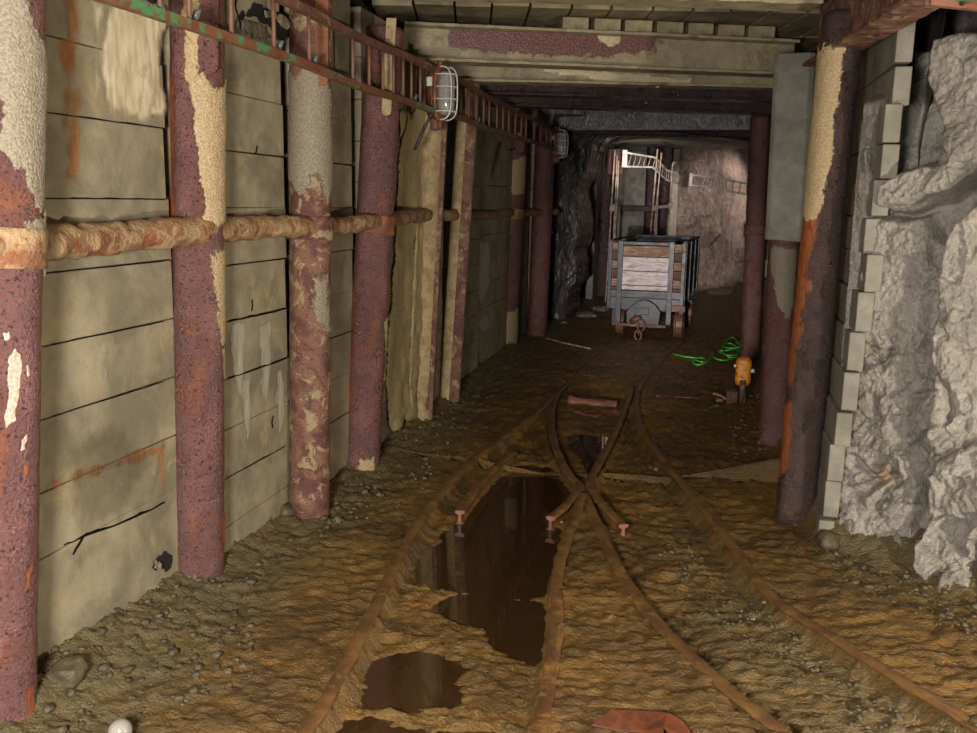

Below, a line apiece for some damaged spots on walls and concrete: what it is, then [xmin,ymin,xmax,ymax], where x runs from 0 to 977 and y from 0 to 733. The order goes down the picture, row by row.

corrosion [60,0,77,71]
peeling [24,210,47,229]
corrosion [787,219,817,385]
peeling [3,332,30,428]
corrosion [778,402,792,477]
crack [64,502,165,555]